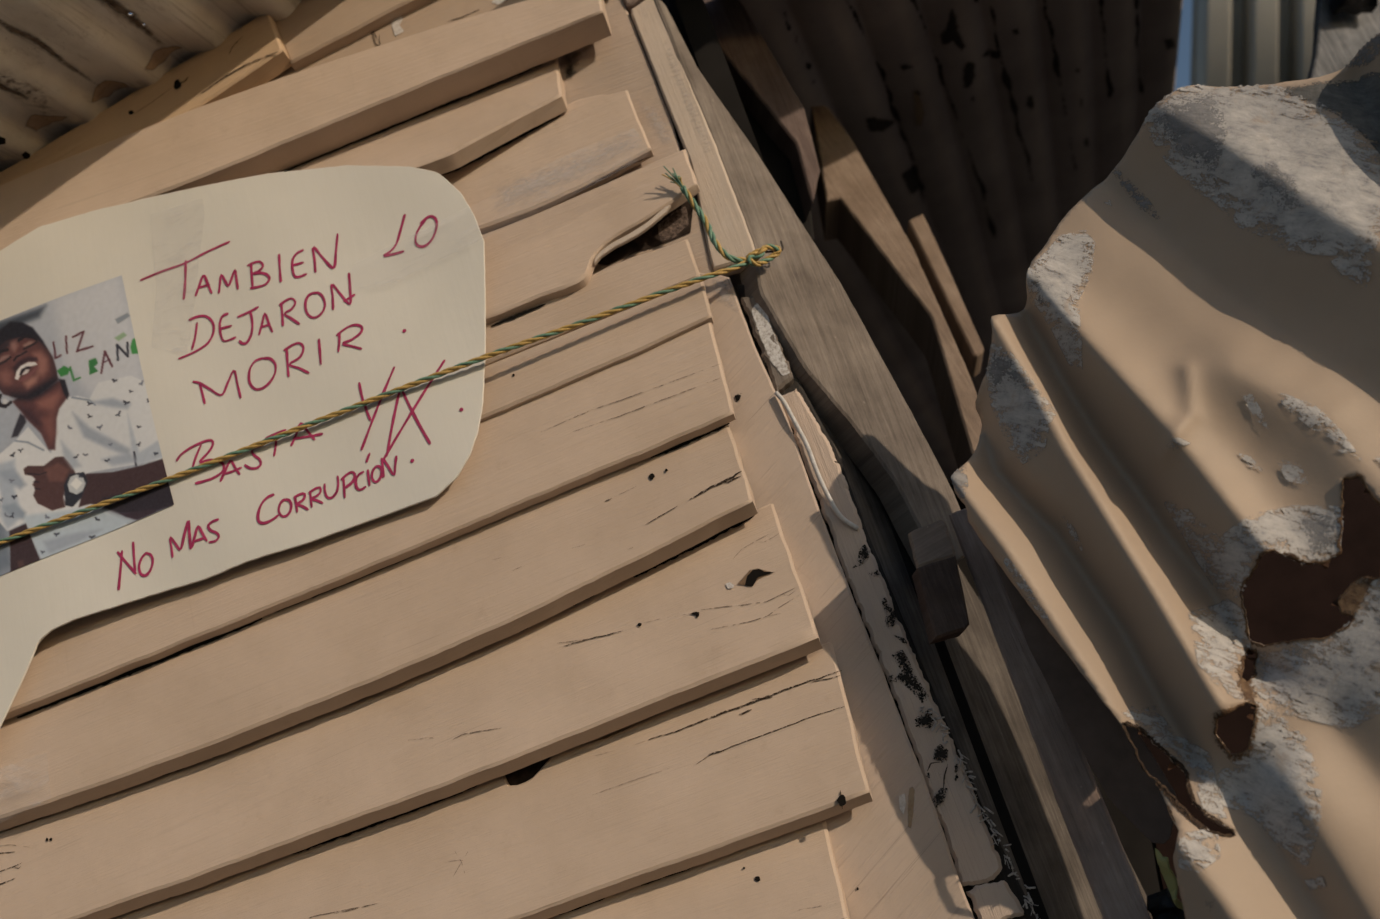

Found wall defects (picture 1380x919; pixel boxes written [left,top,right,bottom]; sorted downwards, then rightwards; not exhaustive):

peeling [1142,34,1380,287]
peeling [1027,230,1095,369]
peeling [986,342,1056,463]
peeling [1280,460,1309,484]
peeling [1281,394,1380,462]
crack [649,670,845,763]
peeling [1124,502,1380,890]
crack [310,903,377,918]